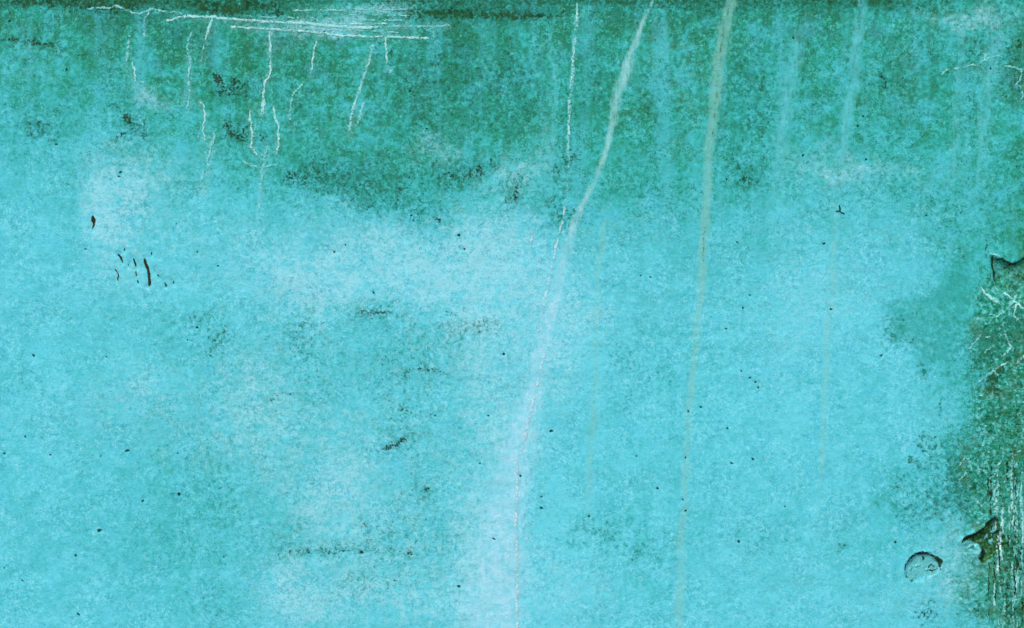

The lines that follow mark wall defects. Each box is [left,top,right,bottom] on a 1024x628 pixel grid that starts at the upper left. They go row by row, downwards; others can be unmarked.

crack [67,4,450,210]
water stain [443,0,655,628]
water stain [873,247,987,386]
water stain [843,486,920,530]
spalling [903,551,943,584]
peeling [951,368,1024,628]